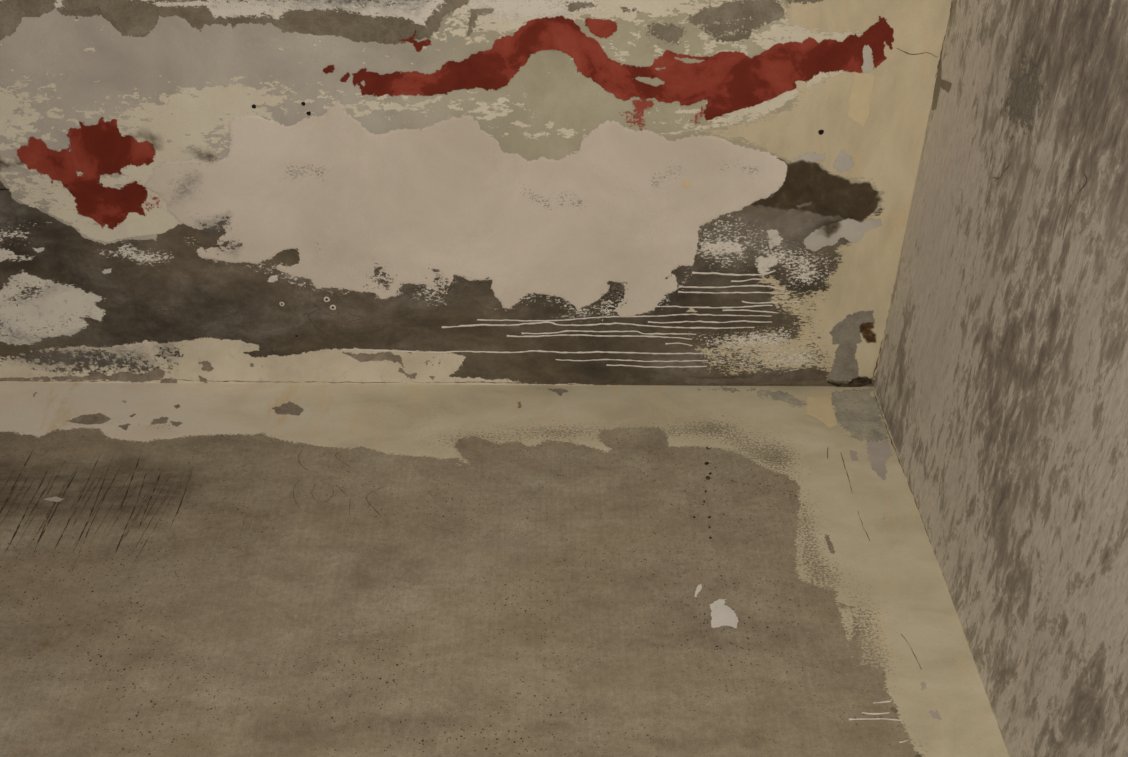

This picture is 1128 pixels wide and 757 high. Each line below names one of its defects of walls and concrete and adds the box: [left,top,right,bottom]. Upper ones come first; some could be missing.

peeling [0,0,952,382]
leakage [752,160,880,236]
peeling [0,337,1009,757]